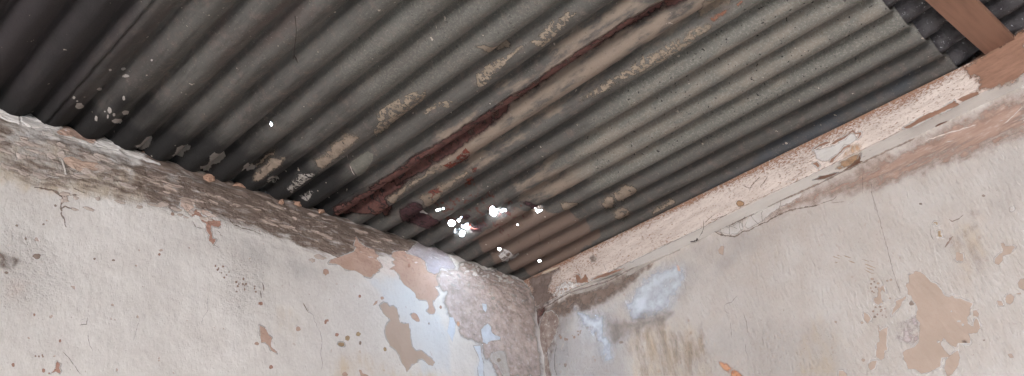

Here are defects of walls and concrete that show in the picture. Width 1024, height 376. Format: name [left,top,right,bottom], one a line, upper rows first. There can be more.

peeling [476,12,577,87]
peeling [582,0,731,101]
peeling [0,109,374,247]
peeling [374,90,452,136]
rust [333,0,684,229]
peeling [719,30,1024,234]
peeling [254,325,277,369]
spalling [309,229,581,376]
leakage [546,267,684,359]
peeling [861,271,985,376]